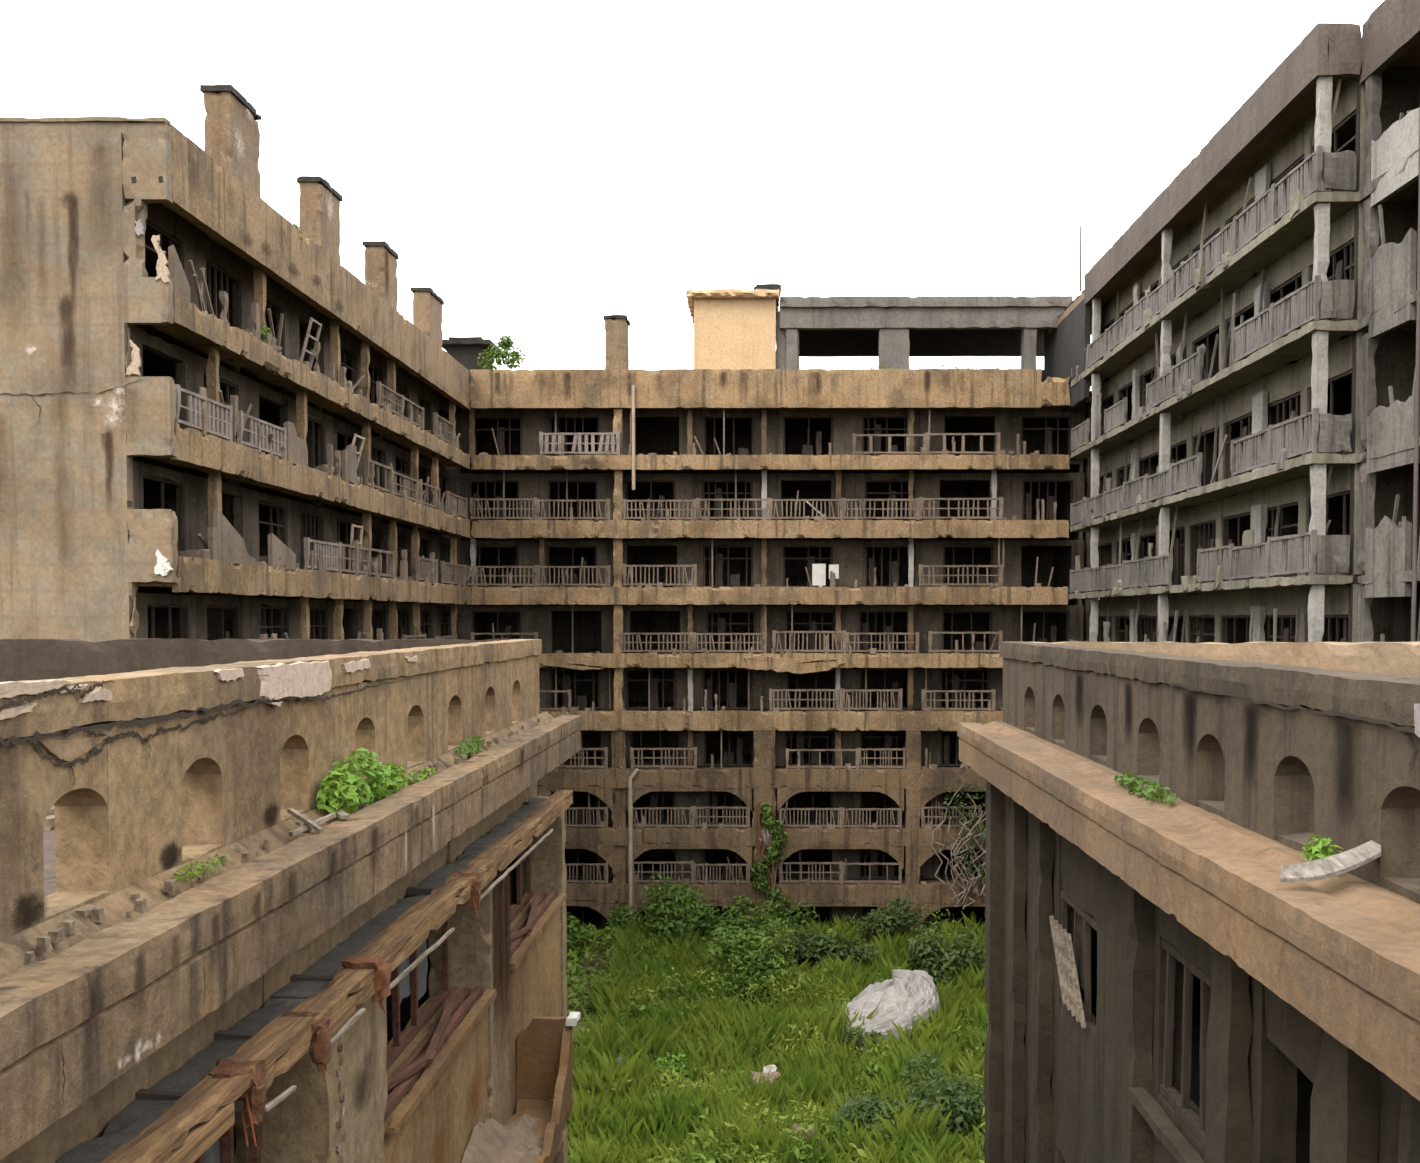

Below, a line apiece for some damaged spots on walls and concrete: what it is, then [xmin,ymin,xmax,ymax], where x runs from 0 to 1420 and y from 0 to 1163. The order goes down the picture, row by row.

damp [61,194,78,367]
crack [0,379,143,422]
crack [0,677,421,785]
peeling [214,659,371,707]